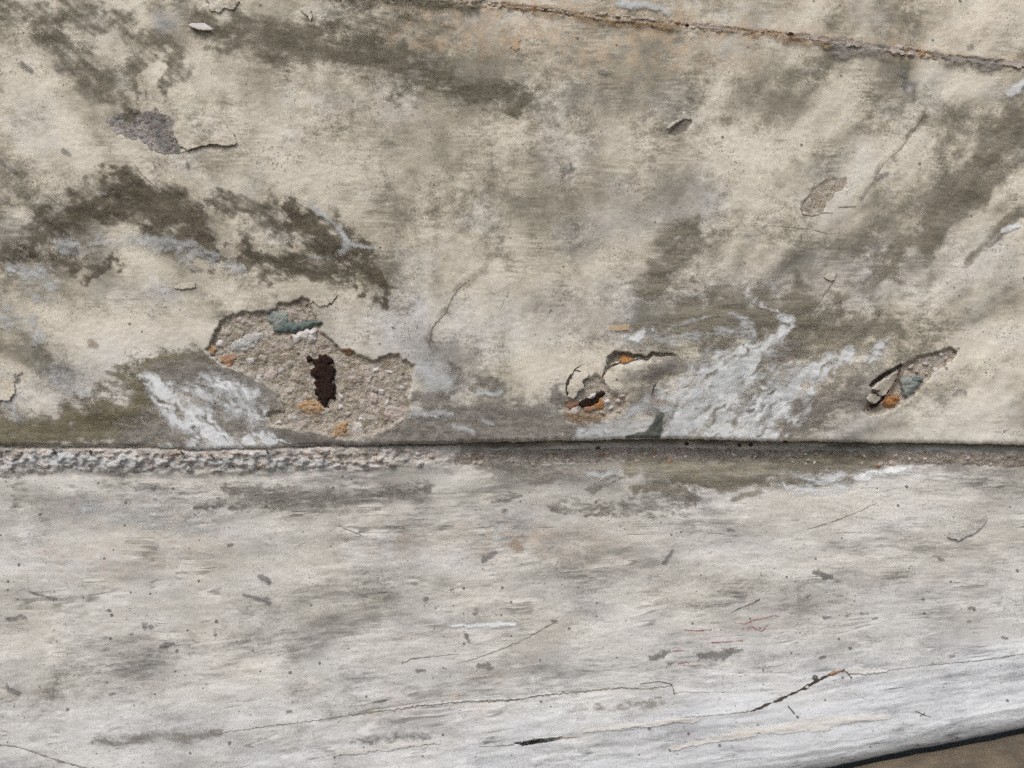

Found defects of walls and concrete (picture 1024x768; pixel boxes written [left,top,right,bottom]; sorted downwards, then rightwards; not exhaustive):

water stain [0,0,191,121]
water stain [193,1,532,119]
crack [349,0,1024,71]
spalling [106,107,186,155]
water stain [0,163,396,310]
water stain [368,79,1024,445]
water stain [0,344,353,450]
spalling [0,295,1024,472]
crack [222,654,1022,733]